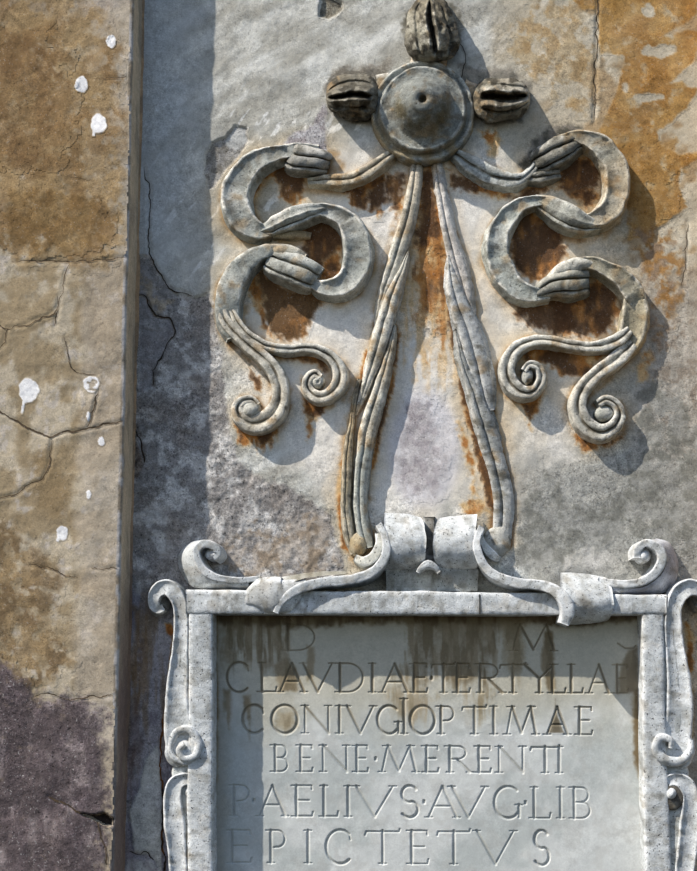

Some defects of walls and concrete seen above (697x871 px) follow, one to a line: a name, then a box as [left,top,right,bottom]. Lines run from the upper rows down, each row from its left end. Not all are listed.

damp [0,0,131,276]
crack [0,257,145,498]
crack [144,171,191,296]
flaking render [203,124,250,190]
rust [371,167,494,520]
rust [509,213,572,286]
rust [509,277,622,342]
rust [578,0,697,242]
damp [0,509,115,871]
flaking render [81,812,113,827]
flaking render [125,743,165,871]
crack [129,693,167,871]